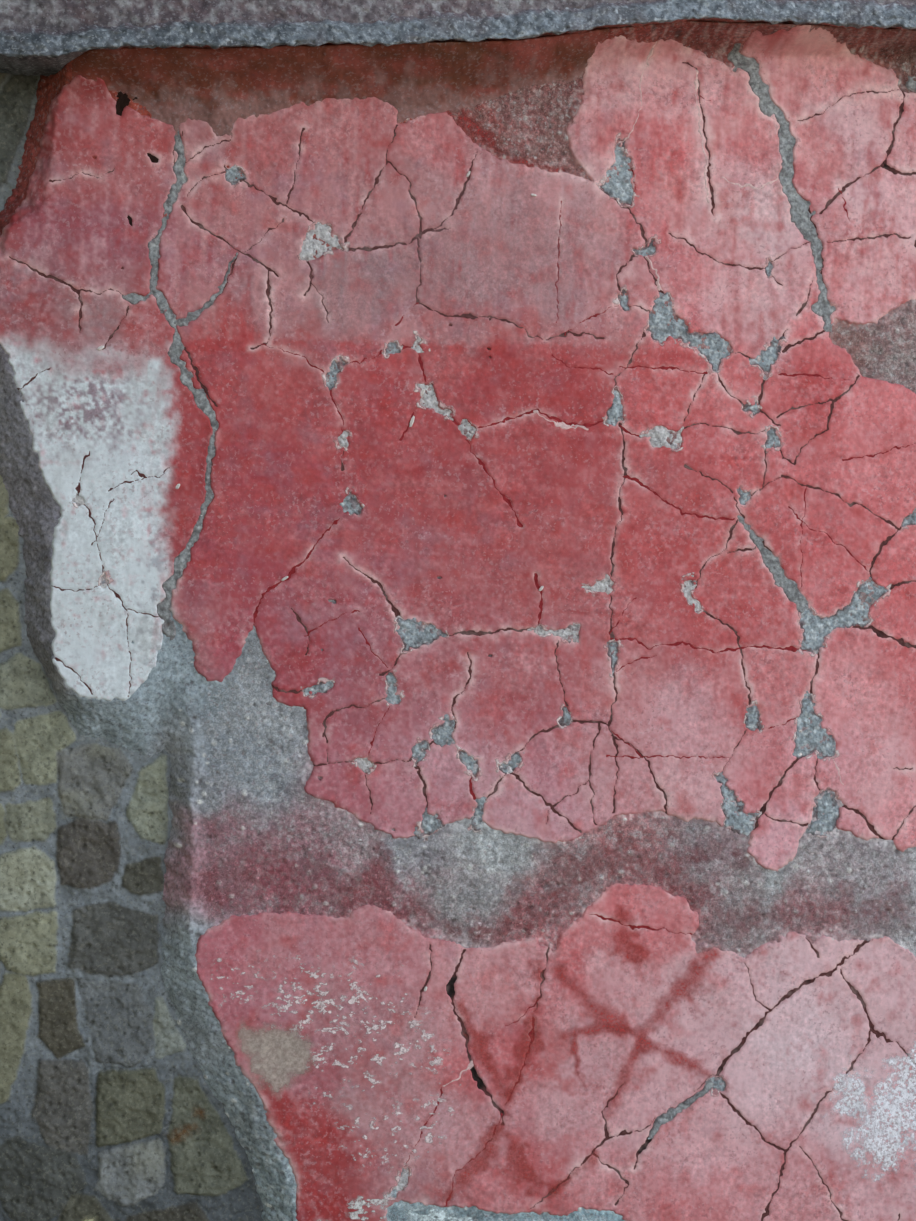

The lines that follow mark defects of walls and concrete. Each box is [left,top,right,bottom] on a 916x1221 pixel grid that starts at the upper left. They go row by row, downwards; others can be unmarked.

peeling [833,309,916,391]
crack [9,41,916,840]
peeling [200,640,916,952]
crack [589,914,692,935]
peeling [211,957,445,1097]
peeling [338,1095,609,1221]
crack [402,944,550,1207]
crack [530,938,916,1221]
damp [834,1043,916,1181]